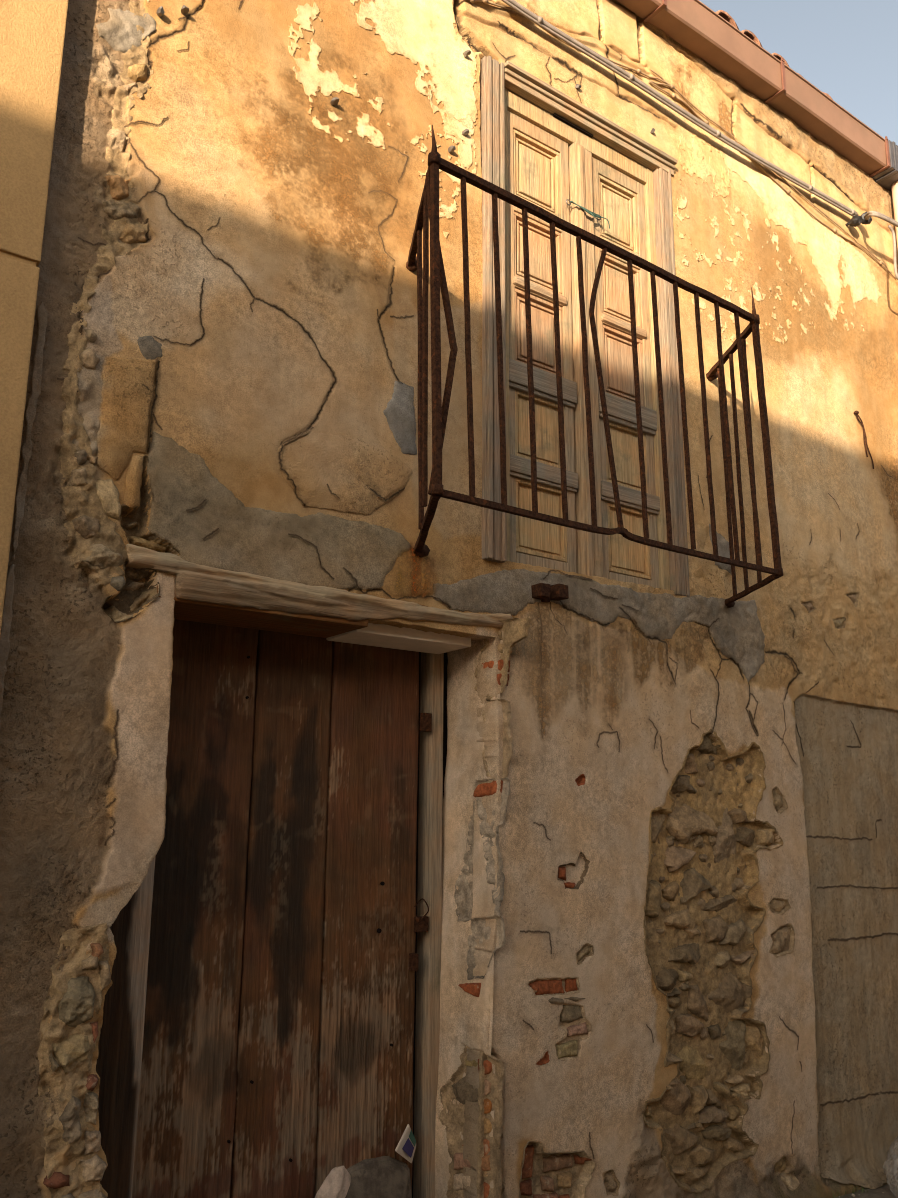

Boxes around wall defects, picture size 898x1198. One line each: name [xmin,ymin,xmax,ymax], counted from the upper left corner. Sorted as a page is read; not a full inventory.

peeling [288,2,390,150]
peeling [350,0,478,238]
crack [123,0,340,506]
crack [368,145,414,384]
peeling [673,133,882,347]
crack [288,533,451,609]
crack [538,569,678,735]
crack [690,607,819,764]
spalling [37,922,111,1198]
spalling [438,1044,620,1198]
spalling [643,729,795,1193]
crack [827,932,898,941]